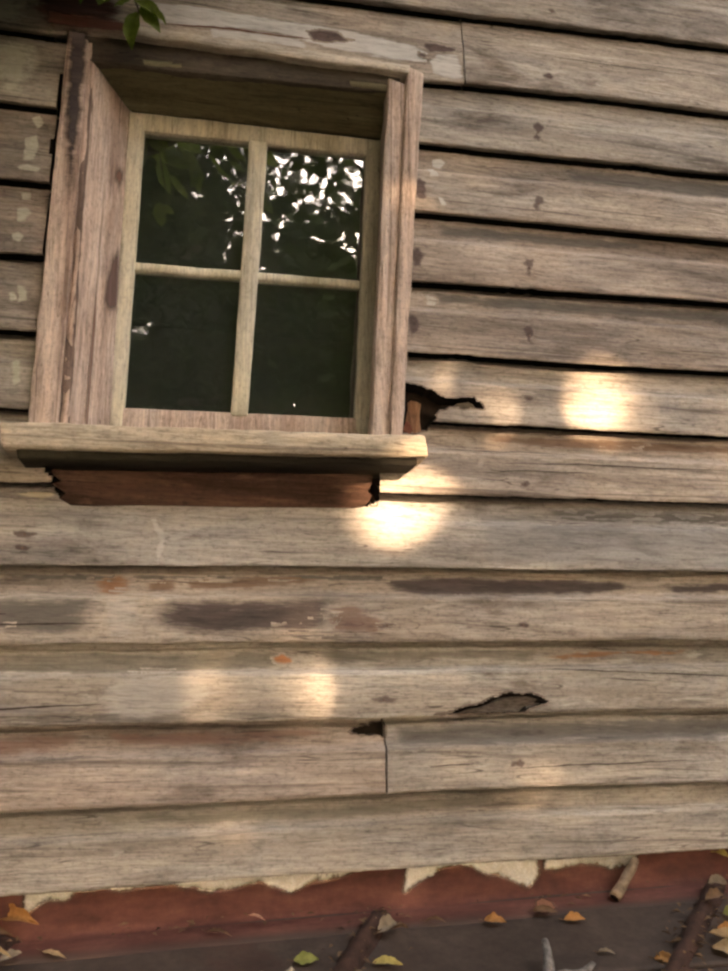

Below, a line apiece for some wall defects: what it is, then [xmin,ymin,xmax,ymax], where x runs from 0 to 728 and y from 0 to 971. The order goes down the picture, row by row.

damp [0,506,728,668]
peeling [176,872,351,892]
peeling [404,855,637,892]
peeling [24,892,74,911]